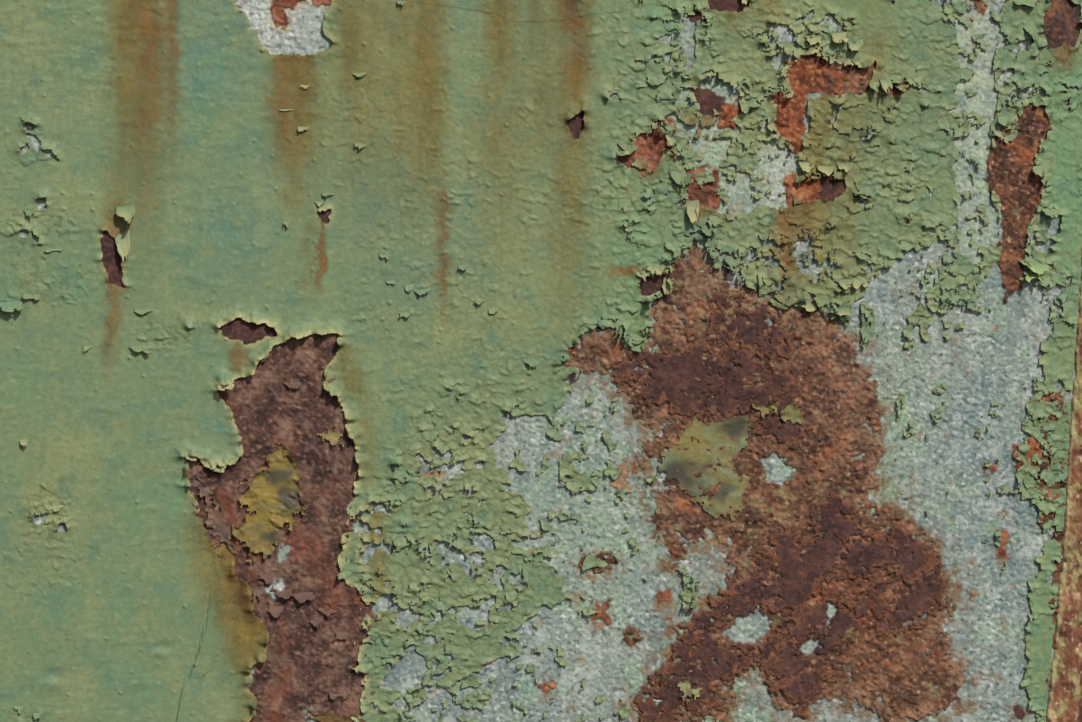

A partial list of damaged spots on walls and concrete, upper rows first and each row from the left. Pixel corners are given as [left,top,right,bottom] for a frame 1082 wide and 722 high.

peeling [226,0,351,66]
rust [275,53,311,135]
peeling [547,88,625,150]
rust [810,152,826,179]
peeling [89,205,141,297]
rust [316,222,327,281]
peeling [308,193,340,228]
peeling [614,0,1082,722]
peeling [177,308,691,722]
rust [555,192,980,722]
rust [1046,247,1082,722]
rust [1014,705,1026,719]